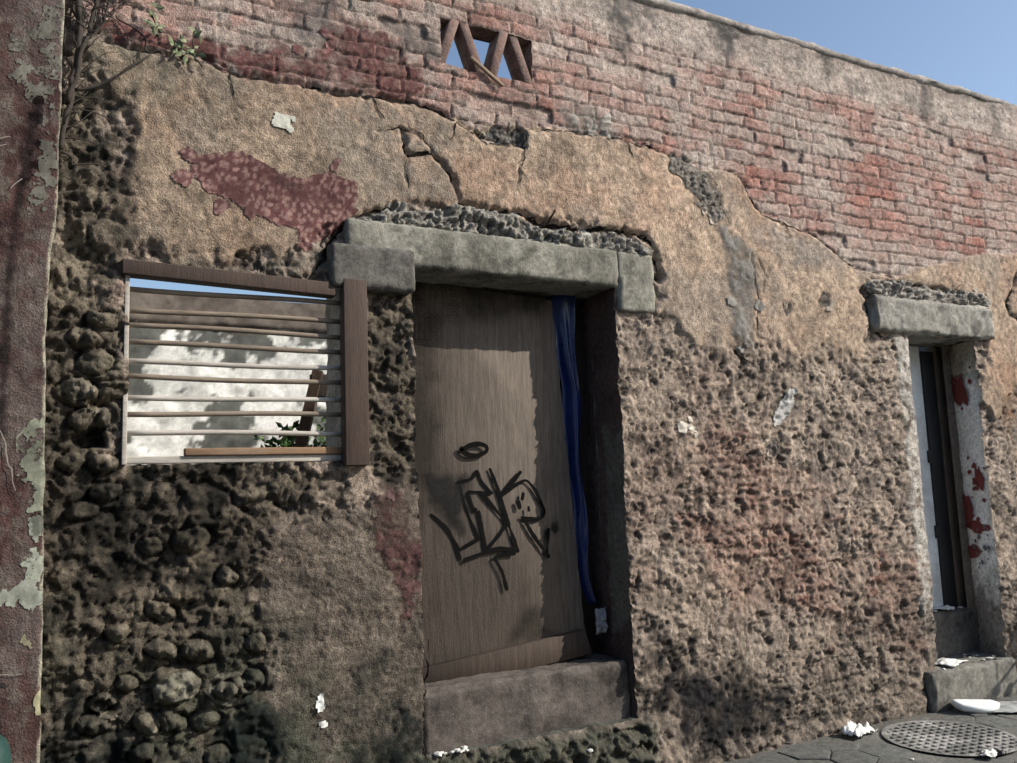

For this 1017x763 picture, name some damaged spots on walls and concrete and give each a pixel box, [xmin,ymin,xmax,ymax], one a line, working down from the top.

peeling [101,18,430,104]
peeling [6,4,65,215]
crack [99,40,669,280]
peeling [170,146,654,256]
spalling [479,121,526,149]
peeling [586,113,613,139]
spalling [668,149,725,225]
spalling [862,279,992,309]
crack [1005,272,1017,320]
peeling [0,418,45,611]
leakage [215,678,284,763]
leakage [651,640,792,761]